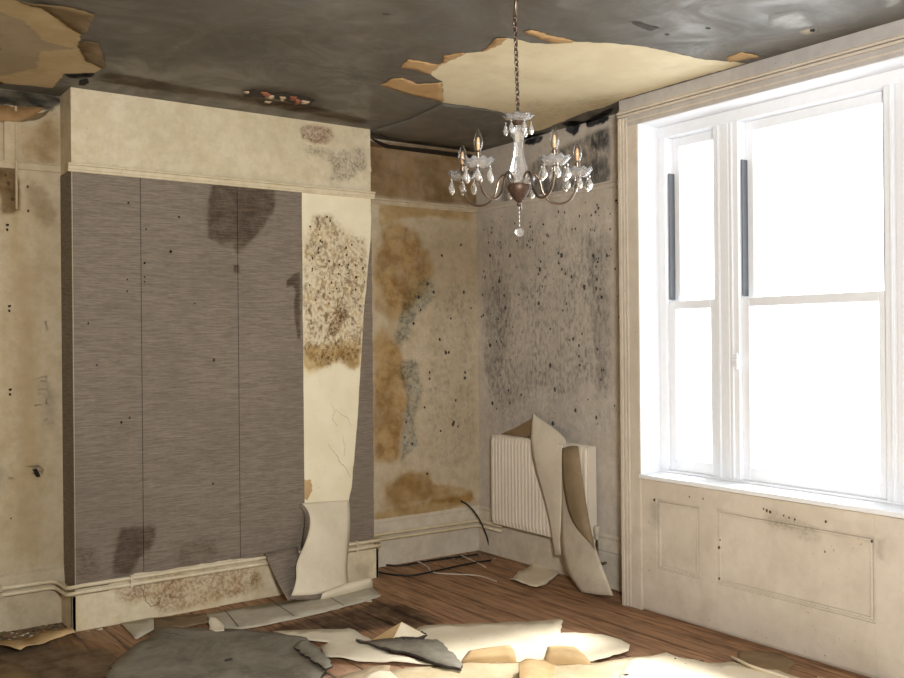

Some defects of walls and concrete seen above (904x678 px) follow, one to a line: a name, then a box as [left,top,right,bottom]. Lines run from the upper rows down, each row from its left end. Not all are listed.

peeling [0,0,107,88]
spalling [243,90,315,106]
peeling [381,30,759,133]
damp [296,121,476,207]
damp [470,109,619,426]
damp [306,213,443,473]